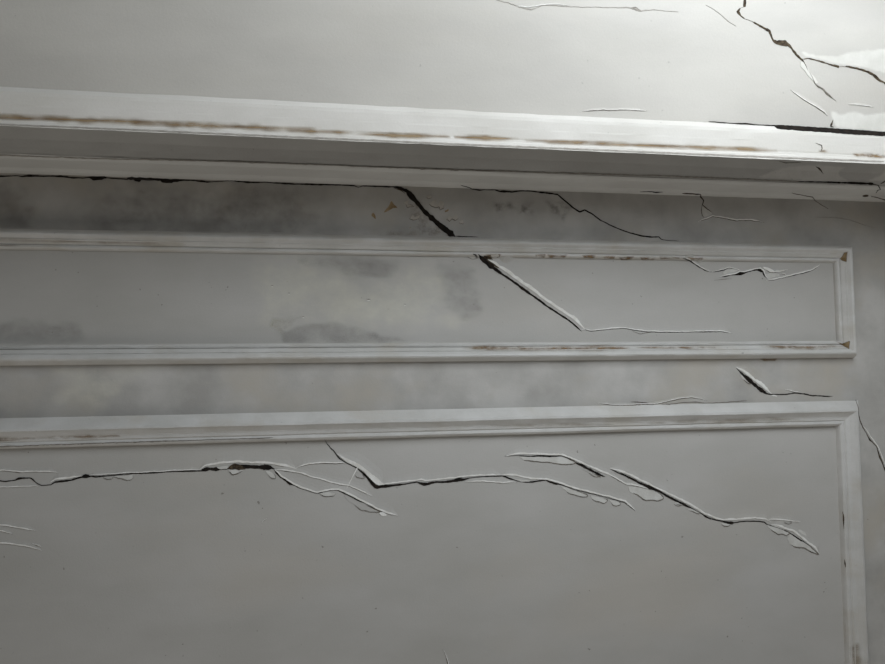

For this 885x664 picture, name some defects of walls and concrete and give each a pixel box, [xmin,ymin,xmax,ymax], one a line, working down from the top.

crack [498,0,677,12]
crack [706,0,885,173]
crack [0,175,731,334]
crack [461,185,821,281]
crack [600,363,832,406]
crack [856,401,885,470]
crack [0,437,820,555]